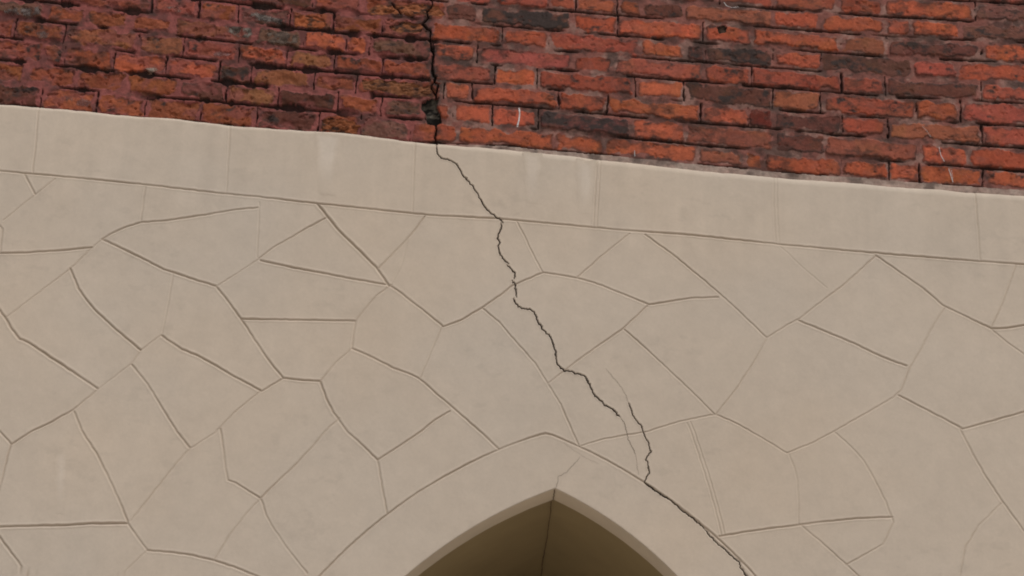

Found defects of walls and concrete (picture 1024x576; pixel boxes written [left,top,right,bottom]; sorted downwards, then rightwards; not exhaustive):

crack [393,0,439,96]
crack [434,124,746,576]